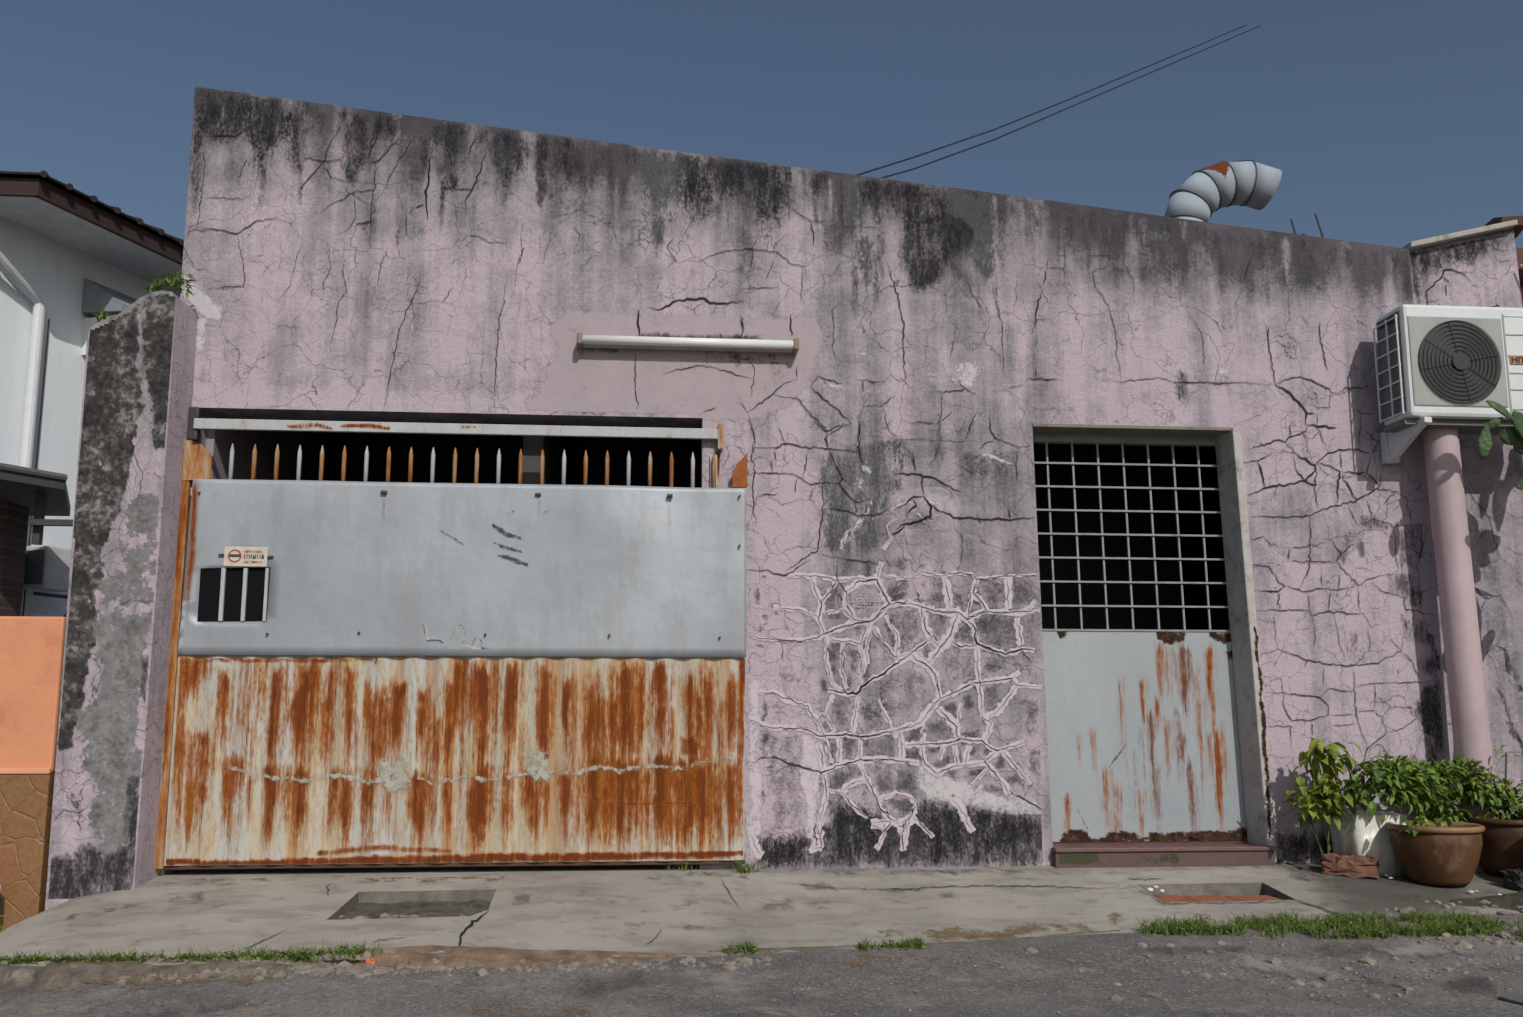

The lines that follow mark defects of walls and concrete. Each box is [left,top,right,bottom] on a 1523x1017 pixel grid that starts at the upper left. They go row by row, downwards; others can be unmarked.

water stain [484,131,1040,309]
water stain [1252,238,1499,297]
corrosion [172,456,197,637]
crack [634,178,1442,852]
water stain [48,777,139,899]
corrosion [161,657,745,865]
crack [459,910,489,946]
peeling [799,733,822,855]
water stain [758,688,1098,869]
peeling [916,763,1041,818]
corrosion [1060,632,1248,842]
corrosion [1254,627,1272,838]